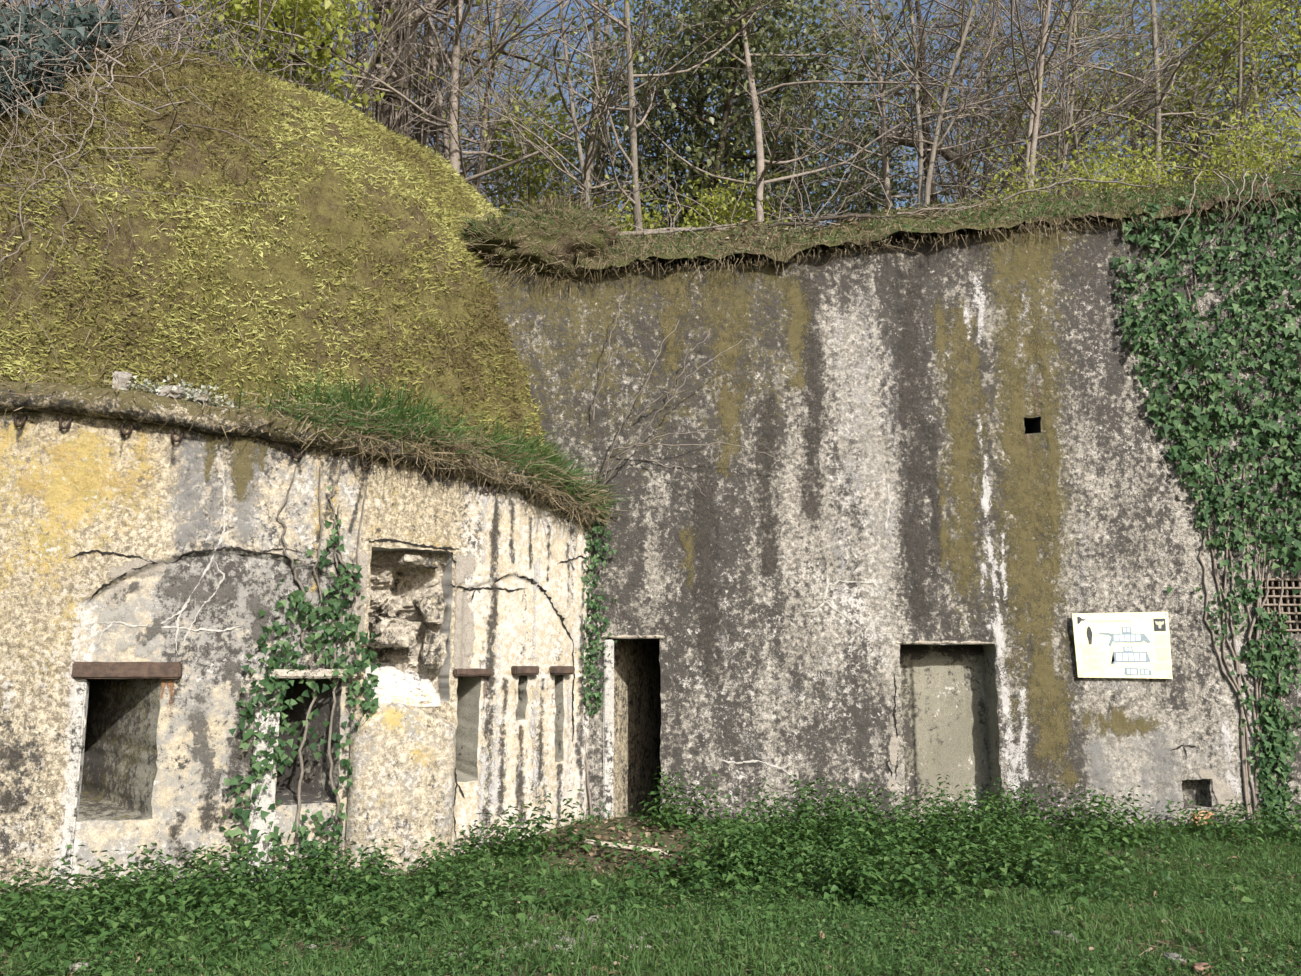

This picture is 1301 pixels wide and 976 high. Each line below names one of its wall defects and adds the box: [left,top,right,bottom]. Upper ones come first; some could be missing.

water stain [963,274,989,344]
water stain [0,746,27,770]
water stain [0,787,28,814]
crack [68,454,589,747]
water stain [476,492,585,843]
water stain [679,448,731,683]
water stain [751,396,782,578]
water stain [781,263,950,618]
water stain [976,419,1030,812]
water stain [1015,282,1061,573]
water stain [1047,701,1182,824]
water stain [1220,607,1264,803]